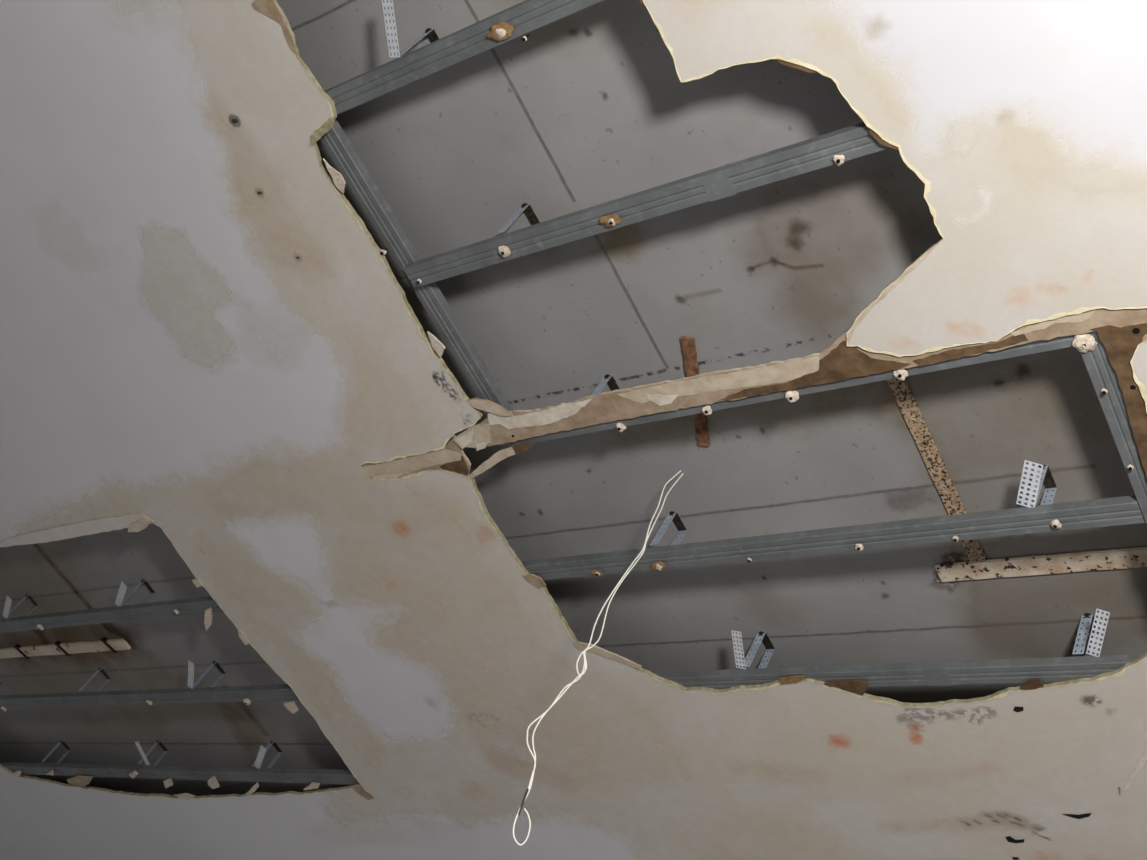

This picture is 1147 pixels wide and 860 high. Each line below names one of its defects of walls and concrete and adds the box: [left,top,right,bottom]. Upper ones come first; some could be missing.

peeling [252,0,297,56]
leakage [644,0,733,81]
peeling [777,59,817,73]
peeling [323,158,346,193]
leakage [189,0,474,455]
leakage [718,10,1147,401]
peeling [427,331,446,357]
peeling [617,356,819,406]
peeling [488,399,592,429]
leakage [22,448,1147,860]
peeling [824,679,868,696]
peeling [1019,679,1044,690]